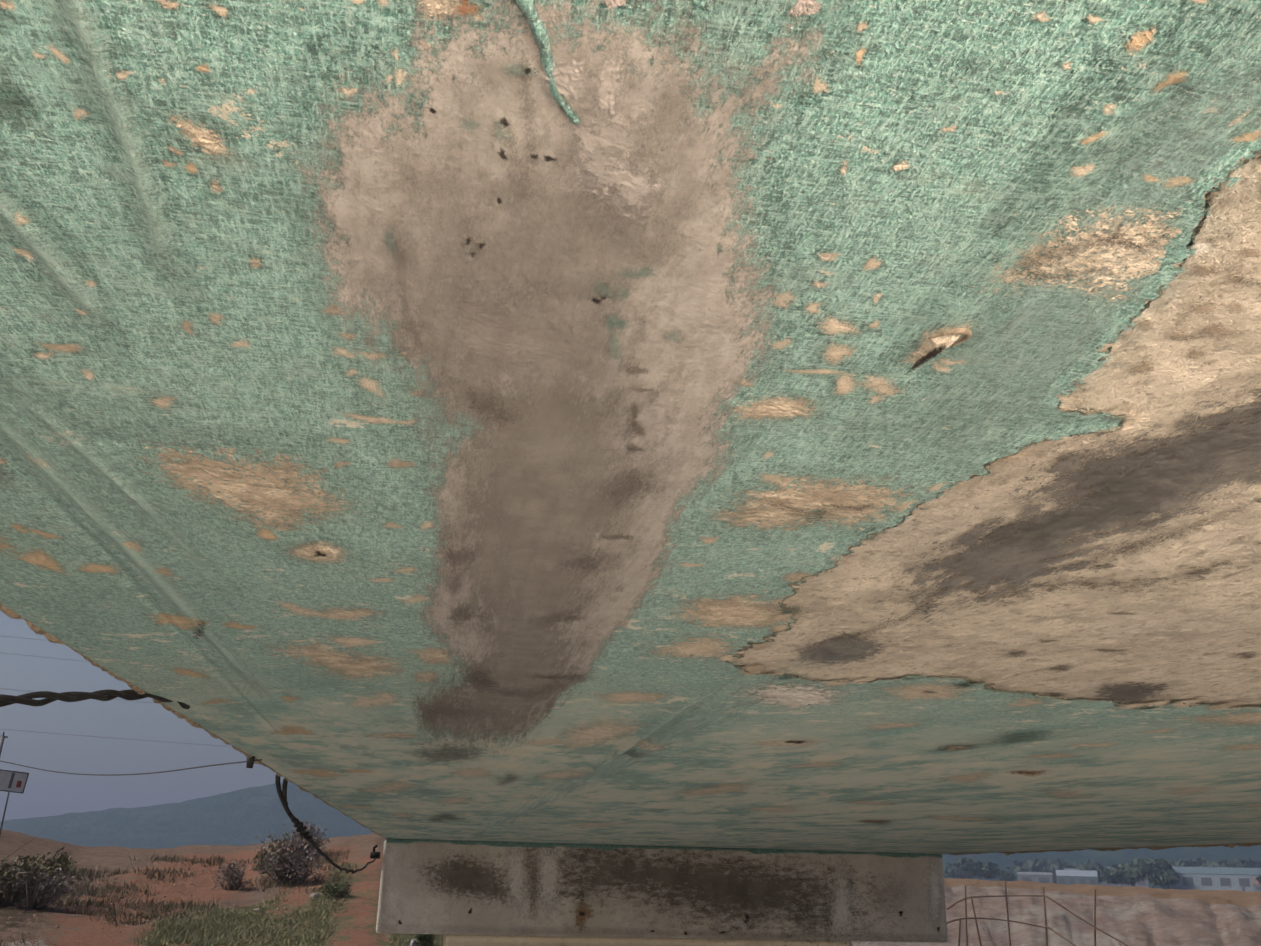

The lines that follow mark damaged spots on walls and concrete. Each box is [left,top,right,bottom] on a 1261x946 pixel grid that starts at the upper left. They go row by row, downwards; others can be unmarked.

peeling [810,75,829,94]
peeling [1150,69,1188,95]
peeling [330,332,417,398]
peeling [341,411,419,426]
water stain [364,74,692,748]
spalling [649,108,1261,726]
peeling [132,434,368,566]
peeling [0,523,120,574]
peeling [276,600,389,622]
water stain [412,846,886,946]